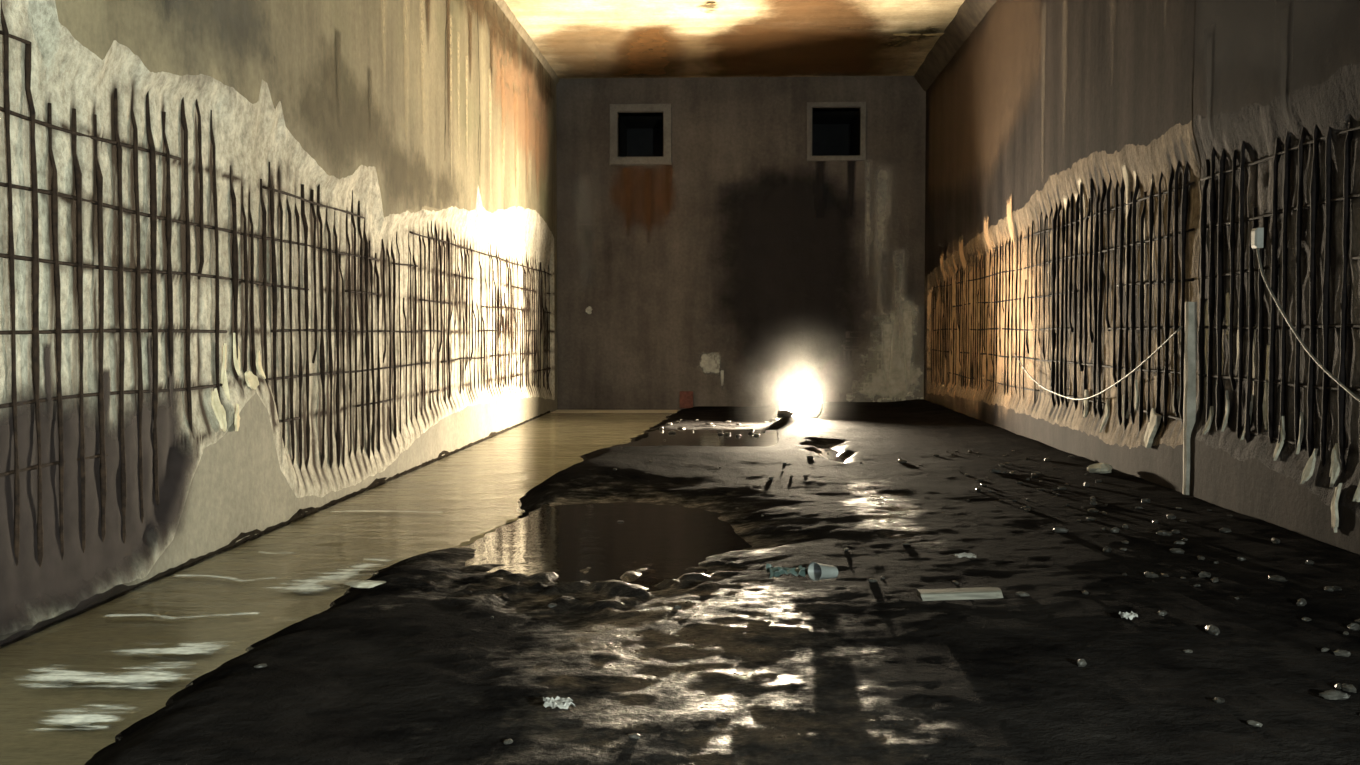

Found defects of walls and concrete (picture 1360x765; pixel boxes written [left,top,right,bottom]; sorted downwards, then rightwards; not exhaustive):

leakage [166,0,265,55]
spalling [0,0,555,567]
spalling [927,63,1360,533]
spalling [98,528,177,594]
spalling [34,609,69,625]